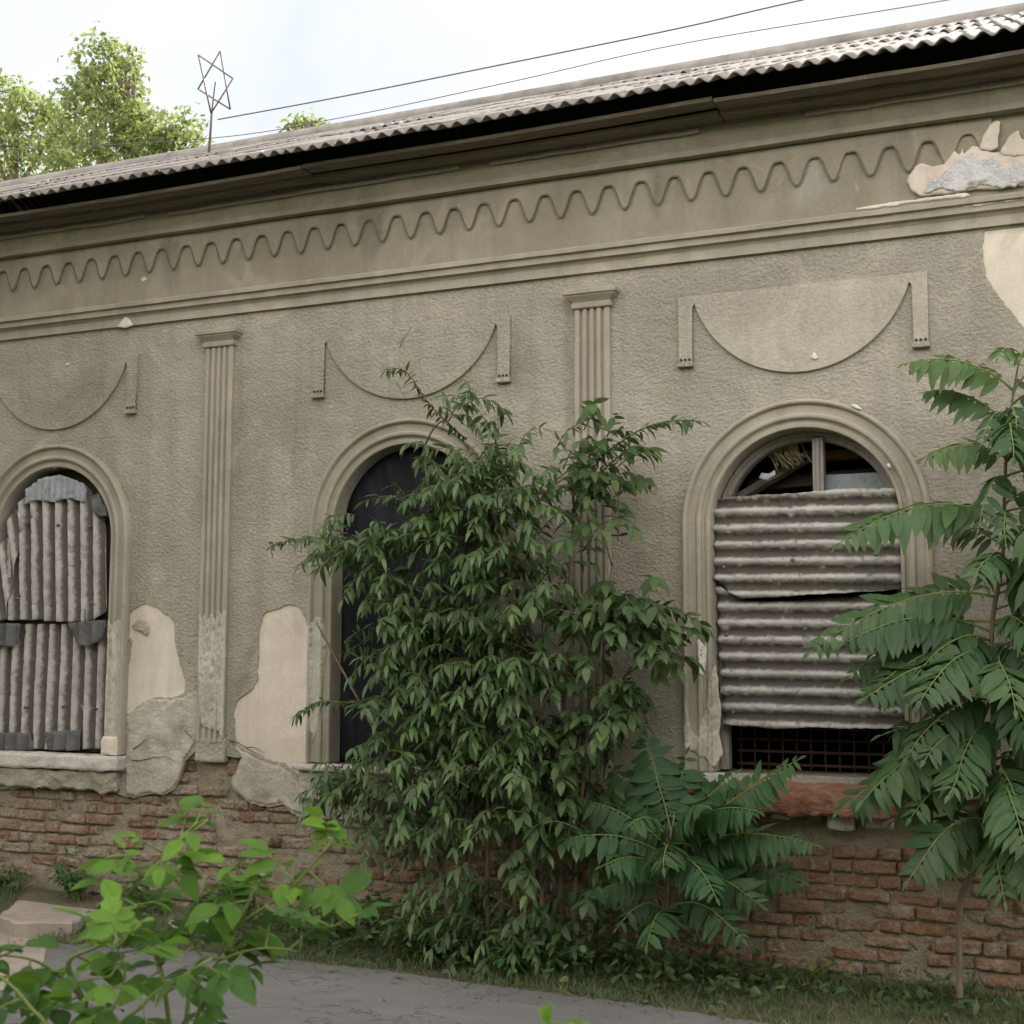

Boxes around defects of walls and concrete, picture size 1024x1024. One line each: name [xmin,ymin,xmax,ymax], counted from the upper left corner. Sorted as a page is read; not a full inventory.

spalling [856,121,1024,211]
peeling [982,227,1024,327]
peeling [104,603,185,738]
peeling [195,605,345,813]
peeling [684,639,735,783]